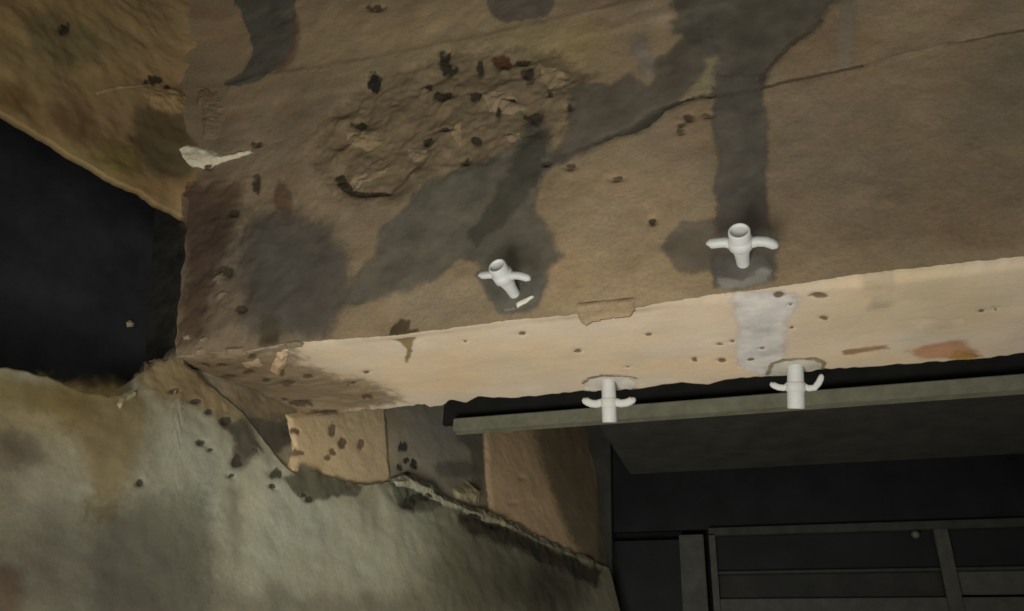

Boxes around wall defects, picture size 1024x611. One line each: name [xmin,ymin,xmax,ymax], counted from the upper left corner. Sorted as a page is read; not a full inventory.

water stain [224,0,297,86]
spalling [426,85,452,101]
spalling [439,51,458,76]
spalling [476,56,570,97]
crack [590,20,956,148]
flaking render [180,142,261,170]
spalling [344,123,390,153]
spalling [403,118,482,166]
spalling [470,88,543,147]
water stain [246,0,853,344]
flaking render [575,297,635,326]
spalling [389,475,590,564]